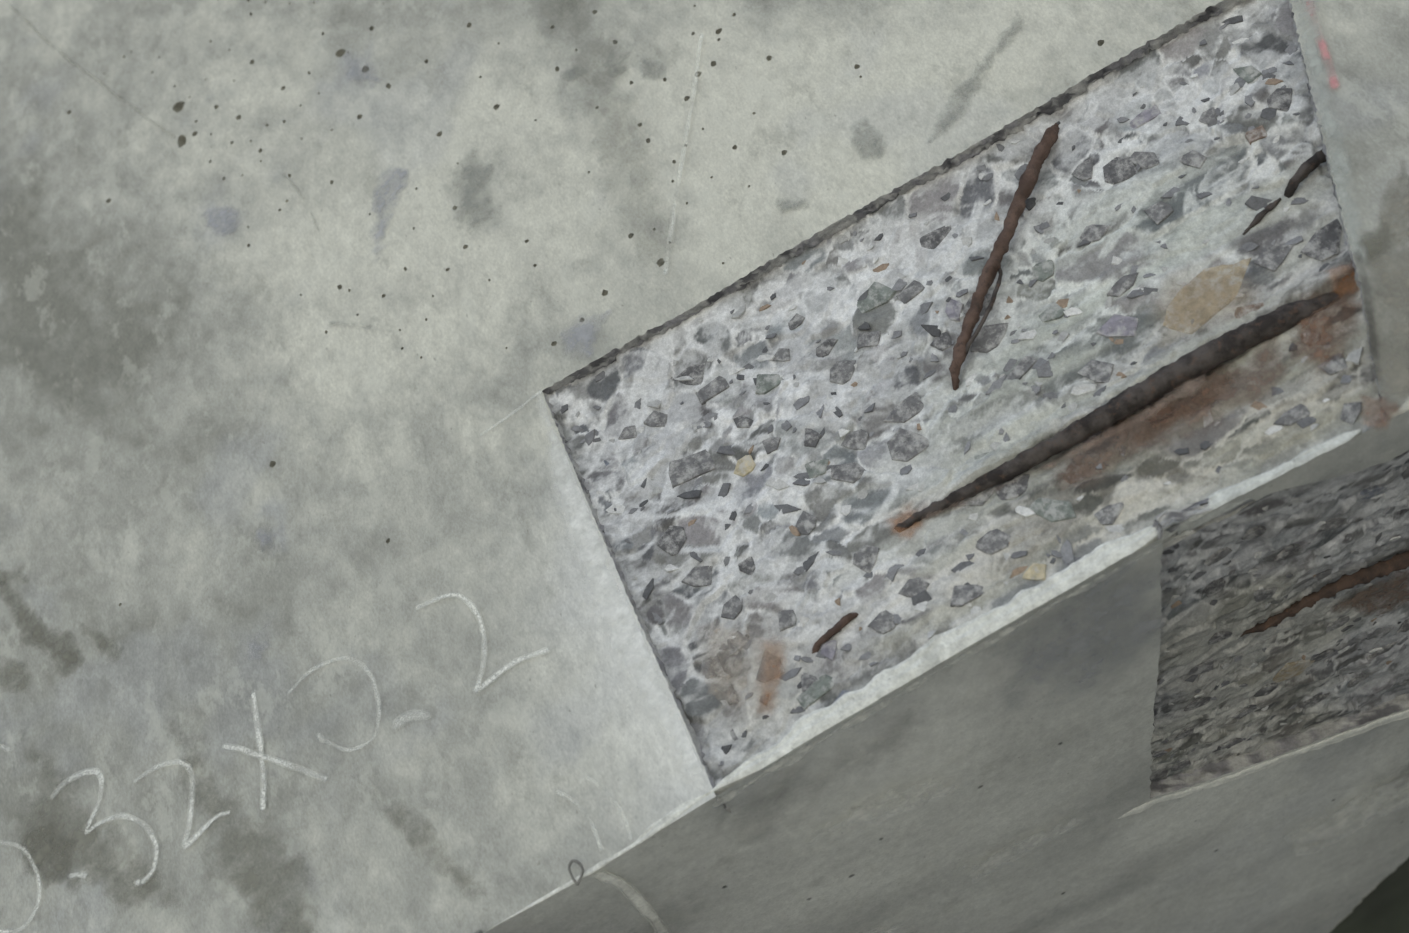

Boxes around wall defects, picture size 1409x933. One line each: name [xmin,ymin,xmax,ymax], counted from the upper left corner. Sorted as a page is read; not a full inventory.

corrosion [1299,266,1358,363]
spalling [490,0,1409,929]
corrosion [1058,345,1284,488]
corrosion [1335,572,1409,616]